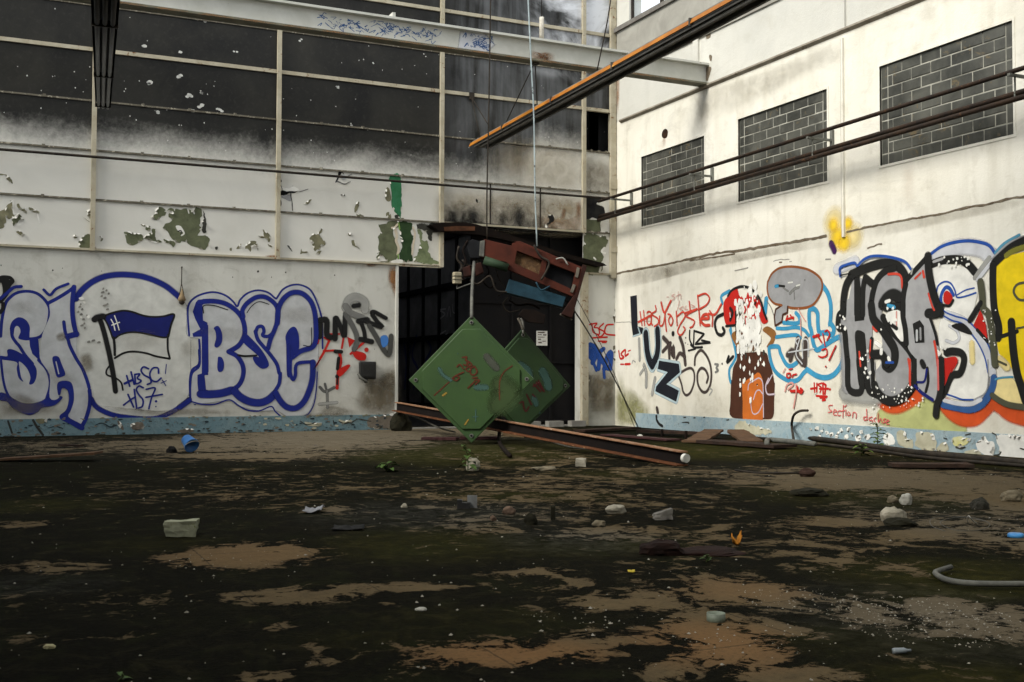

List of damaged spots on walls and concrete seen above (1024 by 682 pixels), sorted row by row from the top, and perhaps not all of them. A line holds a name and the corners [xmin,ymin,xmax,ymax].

peeling [0,199,40,237]
peeling [124,206,272,252]
peeling [287,227,326,255]
peeling [376,173,439,265]
peeling [809,426,870,441]
peeling [883,430,1024,458]